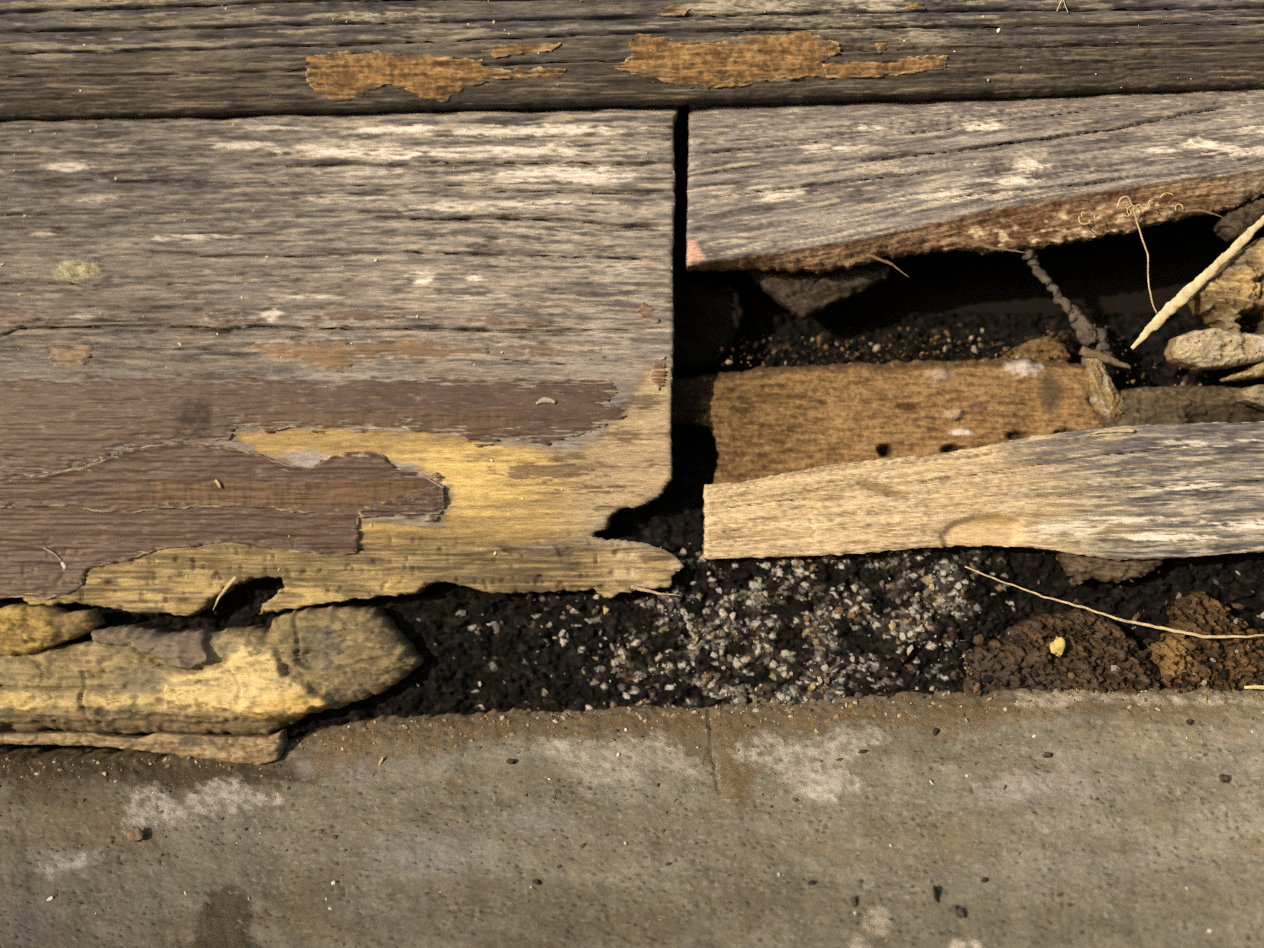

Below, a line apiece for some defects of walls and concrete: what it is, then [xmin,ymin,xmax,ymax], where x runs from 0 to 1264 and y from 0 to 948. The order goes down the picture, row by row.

peeling [661,4,692,18]
peeling [305,43,567,102]
peeling [613,31,949,89]
peeling [650,357,666,390]
peeling [0,305,631,600]